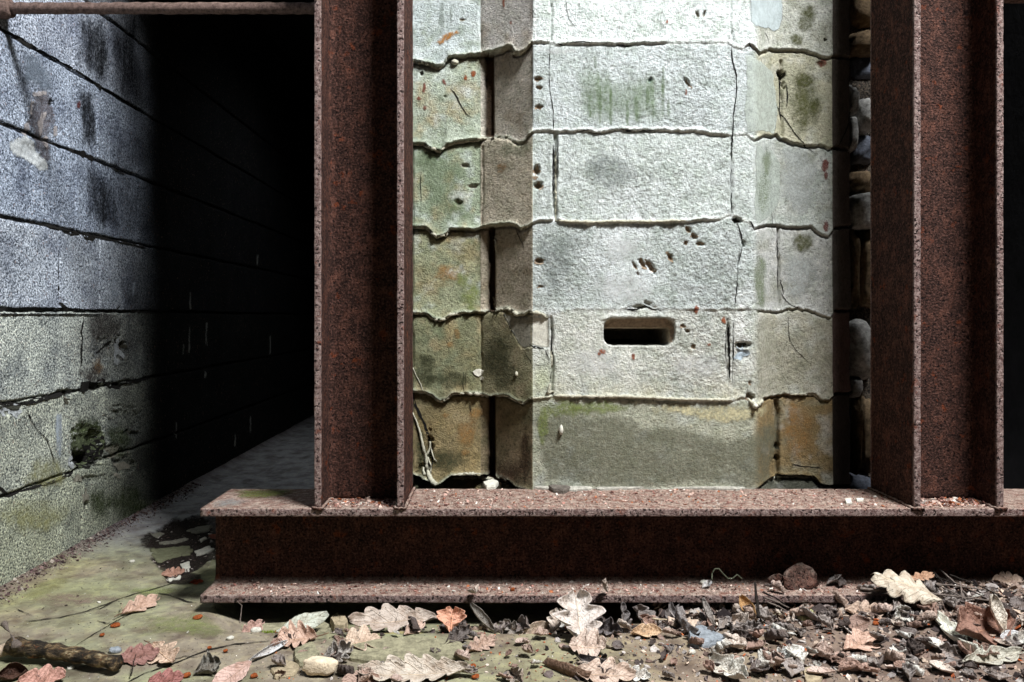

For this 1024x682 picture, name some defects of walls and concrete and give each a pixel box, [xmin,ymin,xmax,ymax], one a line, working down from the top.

leakage [82,18,140,105]
peeling [10,91,57,170]
leakage [82,95,95,143]
leakage [90,173,116,225]
spalling [532,165,544,190]
crack [725,33,813,381]
crack [0,214,164,498]
spalling [505,314,549,347]
leakage [543,417,776,486]
rust [328,496,397,508]